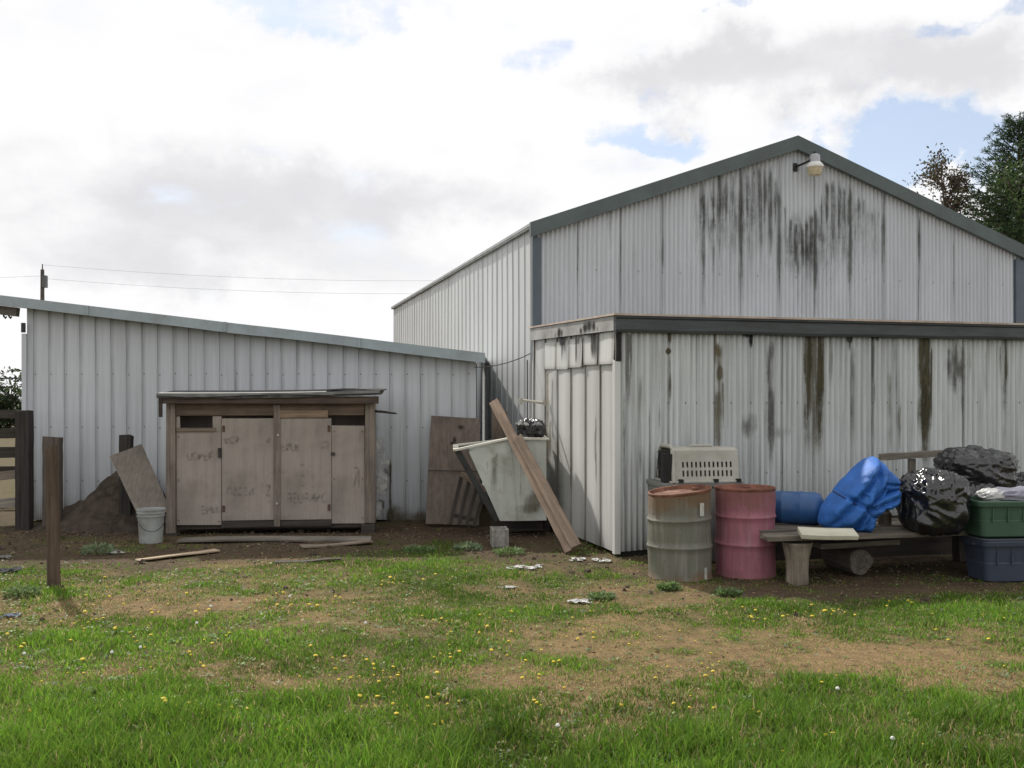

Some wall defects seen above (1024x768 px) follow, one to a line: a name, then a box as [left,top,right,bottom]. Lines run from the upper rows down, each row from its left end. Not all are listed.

damp [739,174,851,285]
damp [715,338,724,442]
damp [804,337,824,432]
damp [919,338,932,450]